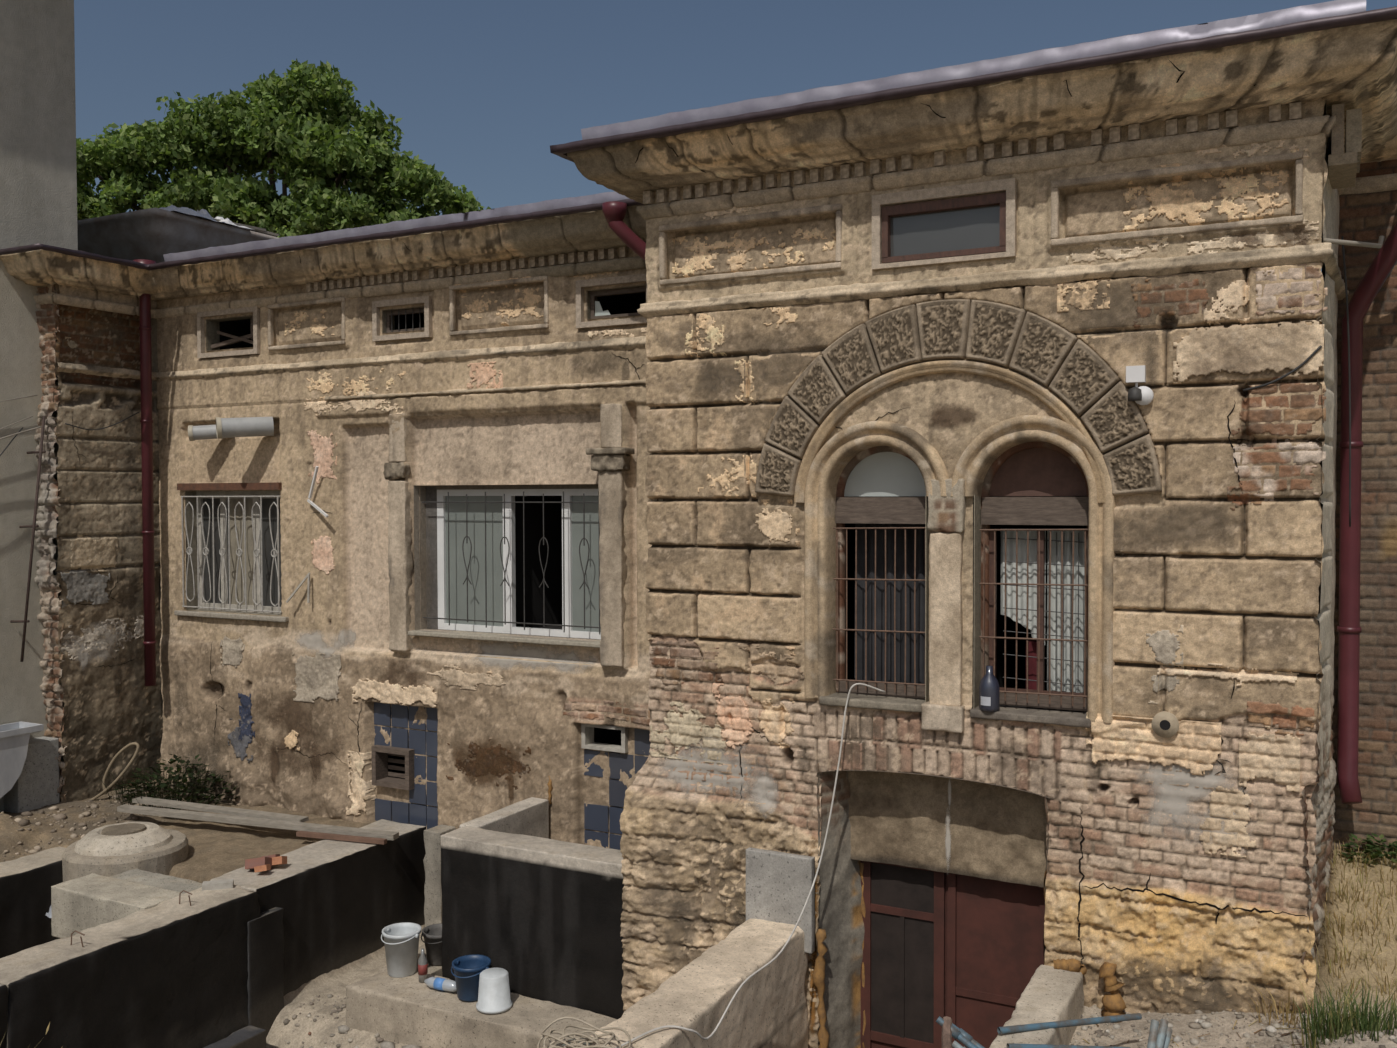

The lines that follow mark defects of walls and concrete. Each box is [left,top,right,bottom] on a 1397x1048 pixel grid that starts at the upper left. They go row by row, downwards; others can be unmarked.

peeling [672,227,836,278]
peeling [1057,136,1319,312]
spalling [1131,264,1328,330]
spalling [1227,376,1326,510]
spalling [32,285,144,803]
spalling [563,700,650,725]
spalling [650,637,724,717]
spalling [737,643,805,703]
crack [1077,809,1307,964]